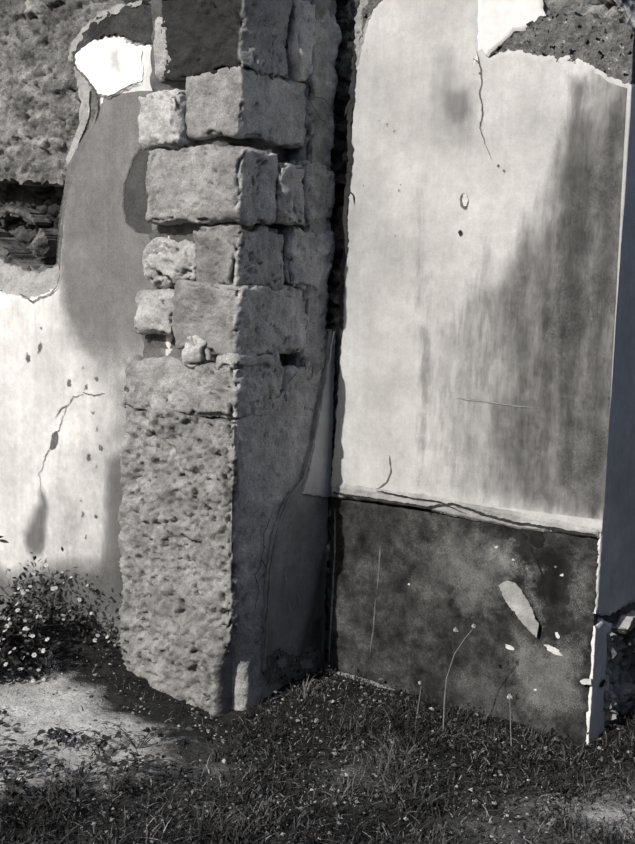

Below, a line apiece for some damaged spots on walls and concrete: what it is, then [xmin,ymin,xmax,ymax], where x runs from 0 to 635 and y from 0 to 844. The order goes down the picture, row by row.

peeling [66,0,153,165]
crack [474,54,505,172]
spalling [494,11,635,84]
spalling [122,146,151,234]
peeling [0,205,62,271]
leakage [493,87,627,516]
crack [38,392,104,500]
crack [333,456,596,537]
flaking render [616,610,635,654]